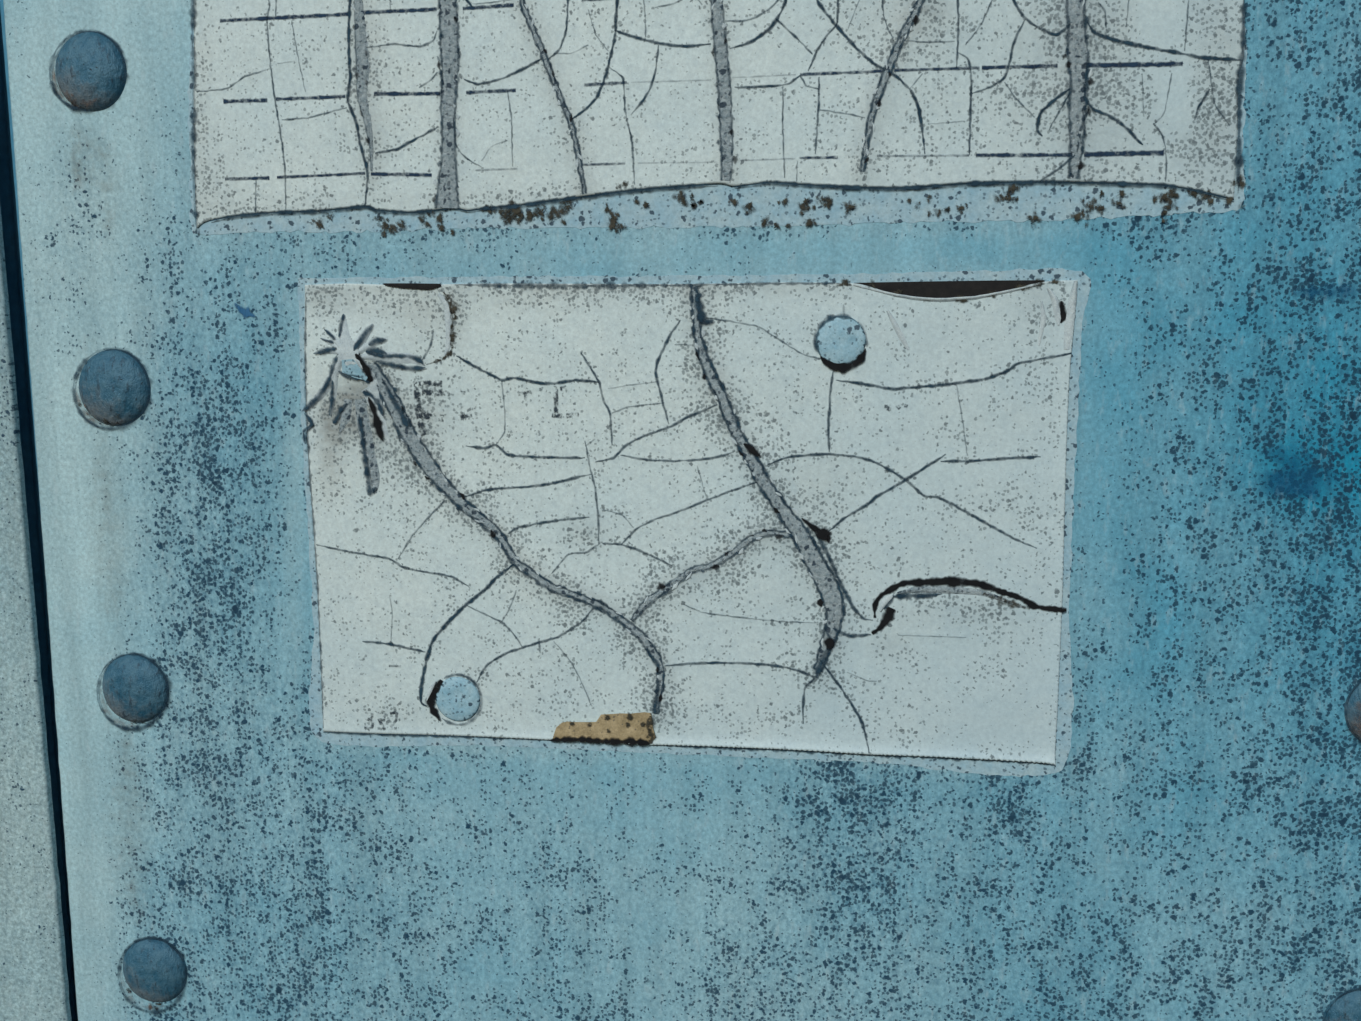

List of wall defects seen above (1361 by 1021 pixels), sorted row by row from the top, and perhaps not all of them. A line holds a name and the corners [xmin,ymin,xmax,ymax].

crack [190,0,1247,234]
crack [304,282,1072,740]
peeling [549,712,656,746]
crack [664,661,1048,765]